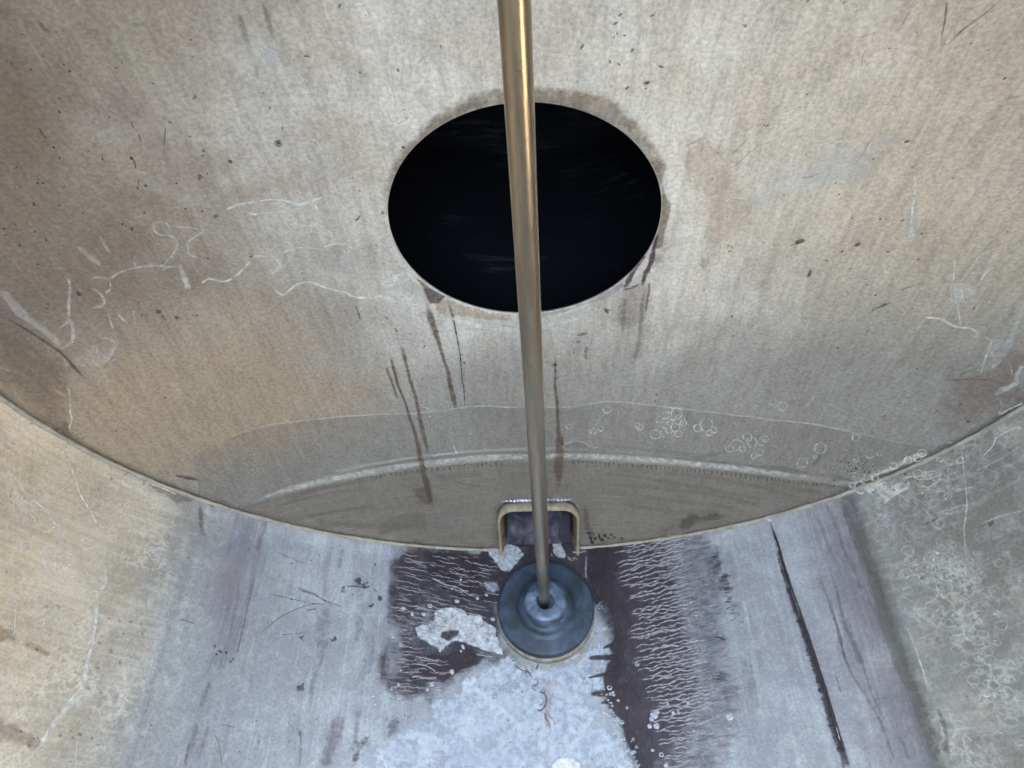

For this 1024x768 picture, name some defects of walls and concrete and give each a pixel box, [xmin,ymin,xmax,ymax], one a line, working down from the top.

corrosion [386,354,431,501]
corrosion [554,364,563,480]
damp [353,529,748,768]